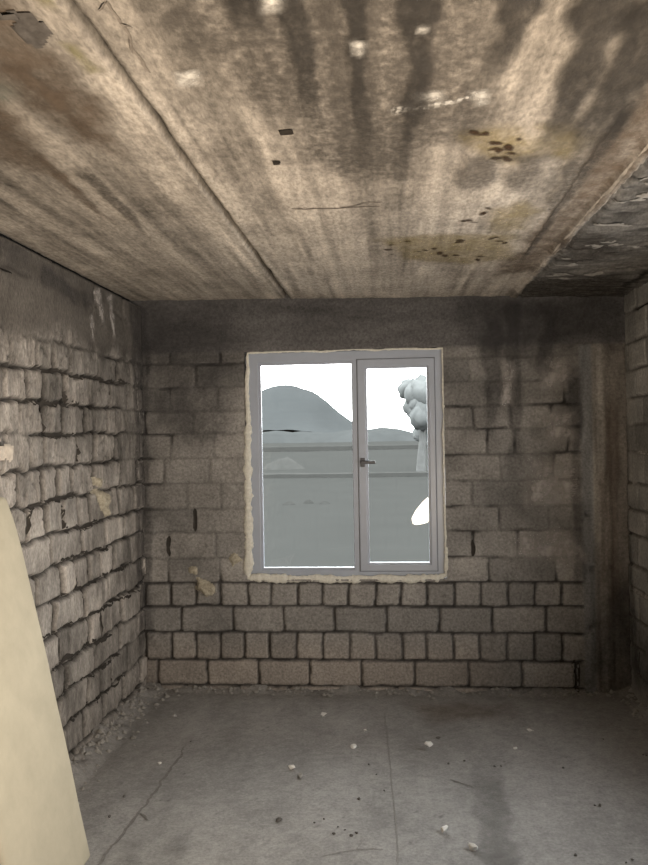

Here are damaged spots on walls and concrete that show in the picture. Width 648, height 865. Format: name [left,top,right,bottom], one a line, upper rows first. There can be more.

damp [163,0,543,174]
damp [501,0,648,273]
flaking render [0,439,14,469]